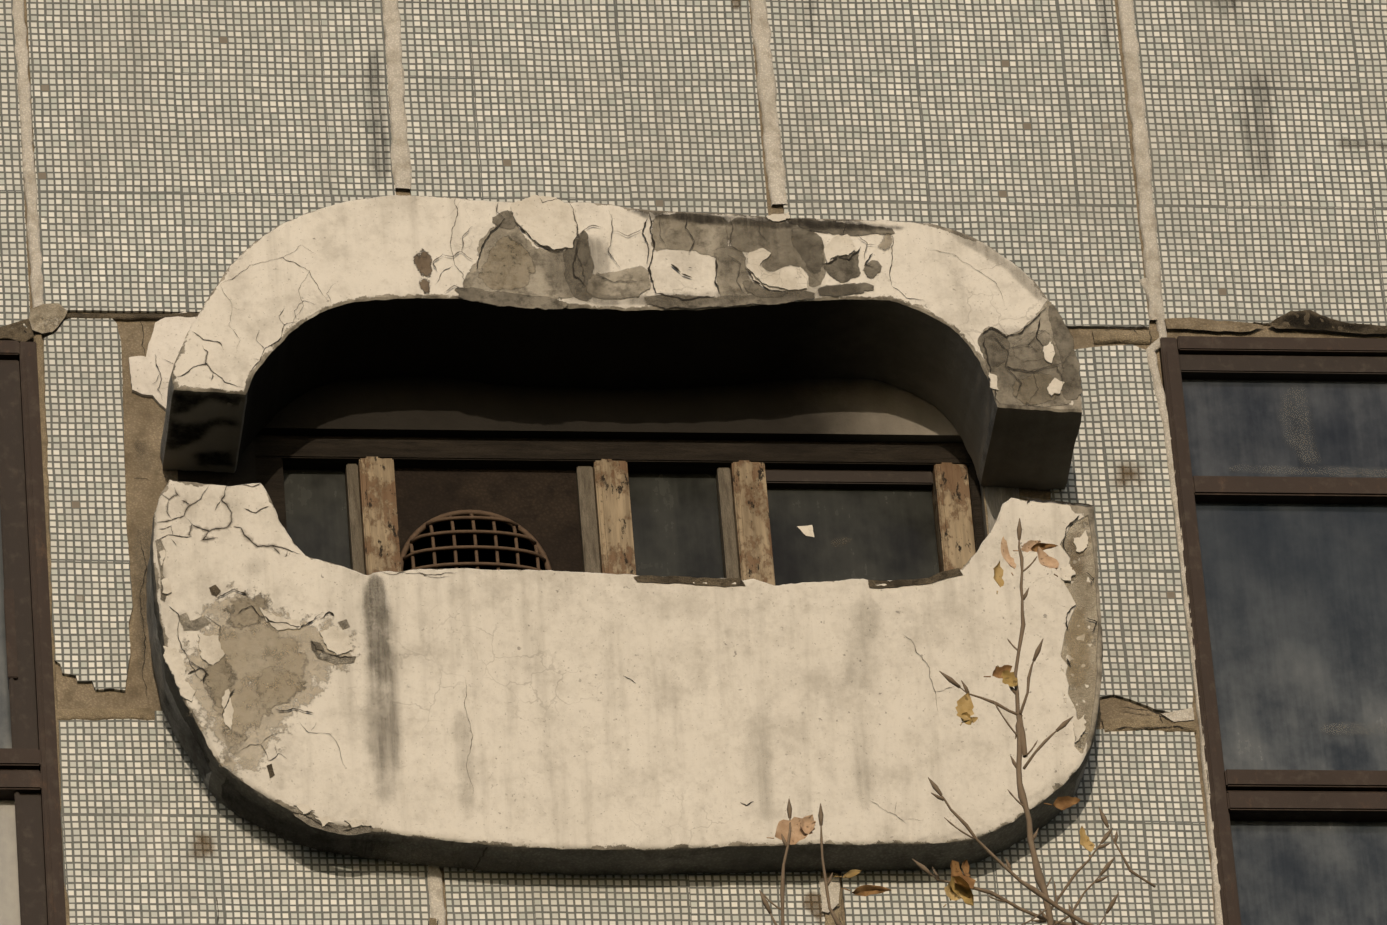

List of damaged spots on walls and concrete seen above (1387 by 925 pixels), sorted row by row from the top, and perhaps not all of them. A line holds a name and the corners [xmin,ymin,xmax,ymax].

crack [433,200,503,293]
crack [538,195,695,287]
peeling [455,195,895,310]
crack [140,245,336,398]
peeling [978,301,1082,407]
spalling [1165,310,1387,334]
peeling [155,539,172,602]
peeling [163,585,356,730]
peeling [1060,516,1098,754]